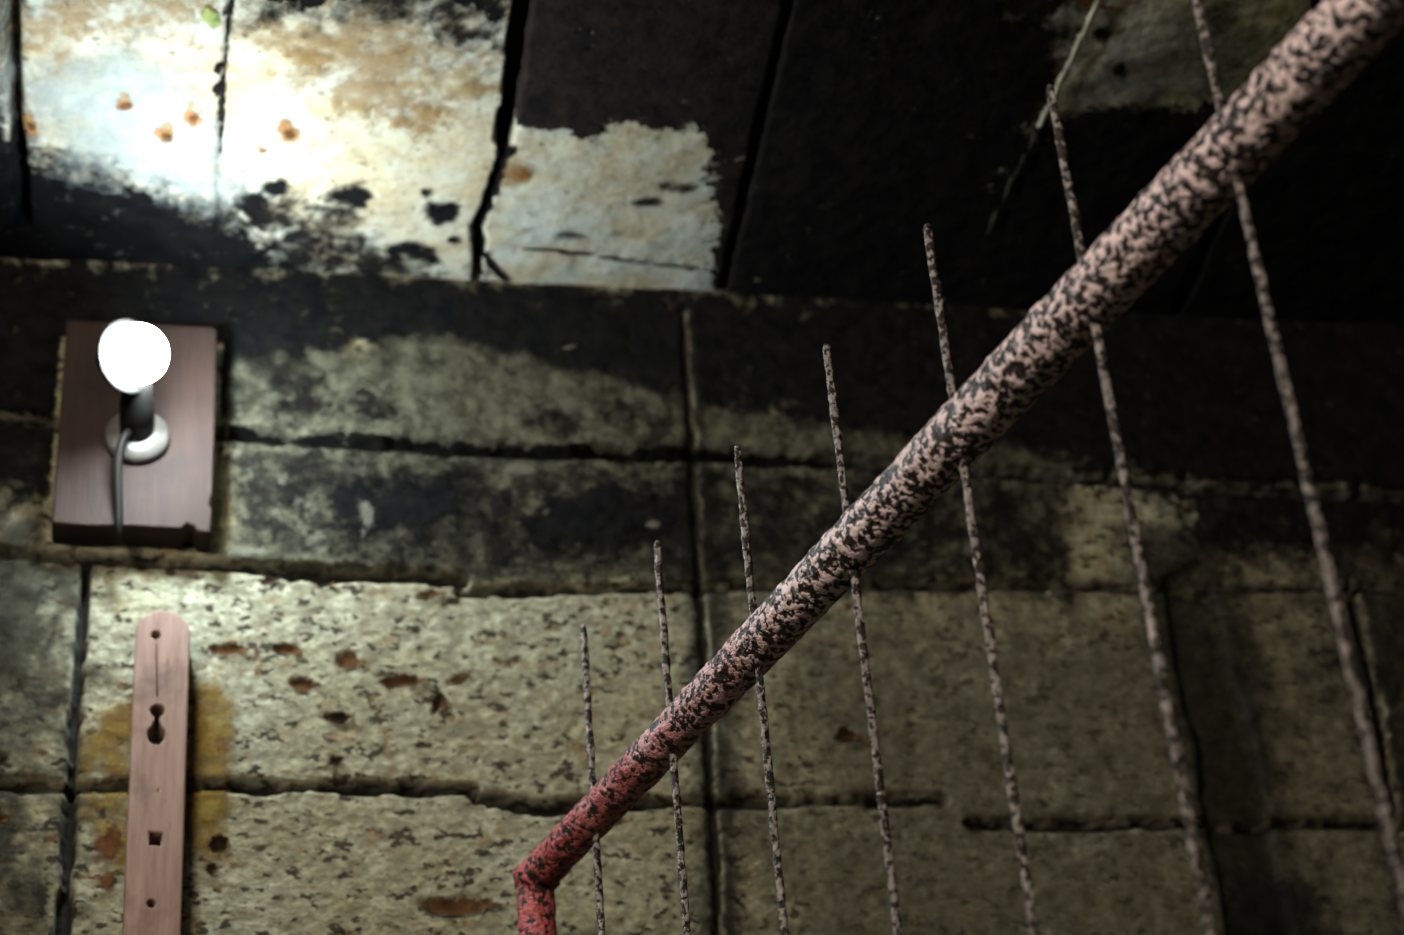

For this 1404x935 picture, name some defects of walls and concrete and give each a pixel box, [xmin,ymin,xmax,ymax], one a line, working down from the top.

damp [232,0,514,134]
corrosion [21,104,38,135]
corrosion [116,93,132,111]
corrosion [155,105,202,142]
damp [17,0,430,277]
corrosion [276,120,299,143]
damp [421,189,459,245]
spalling [207,642,250,656]
spalling [272,642,302,654]
spalling [289,676,322,692]
spalling [381,674,473,713]
damp [184,669,234,860]